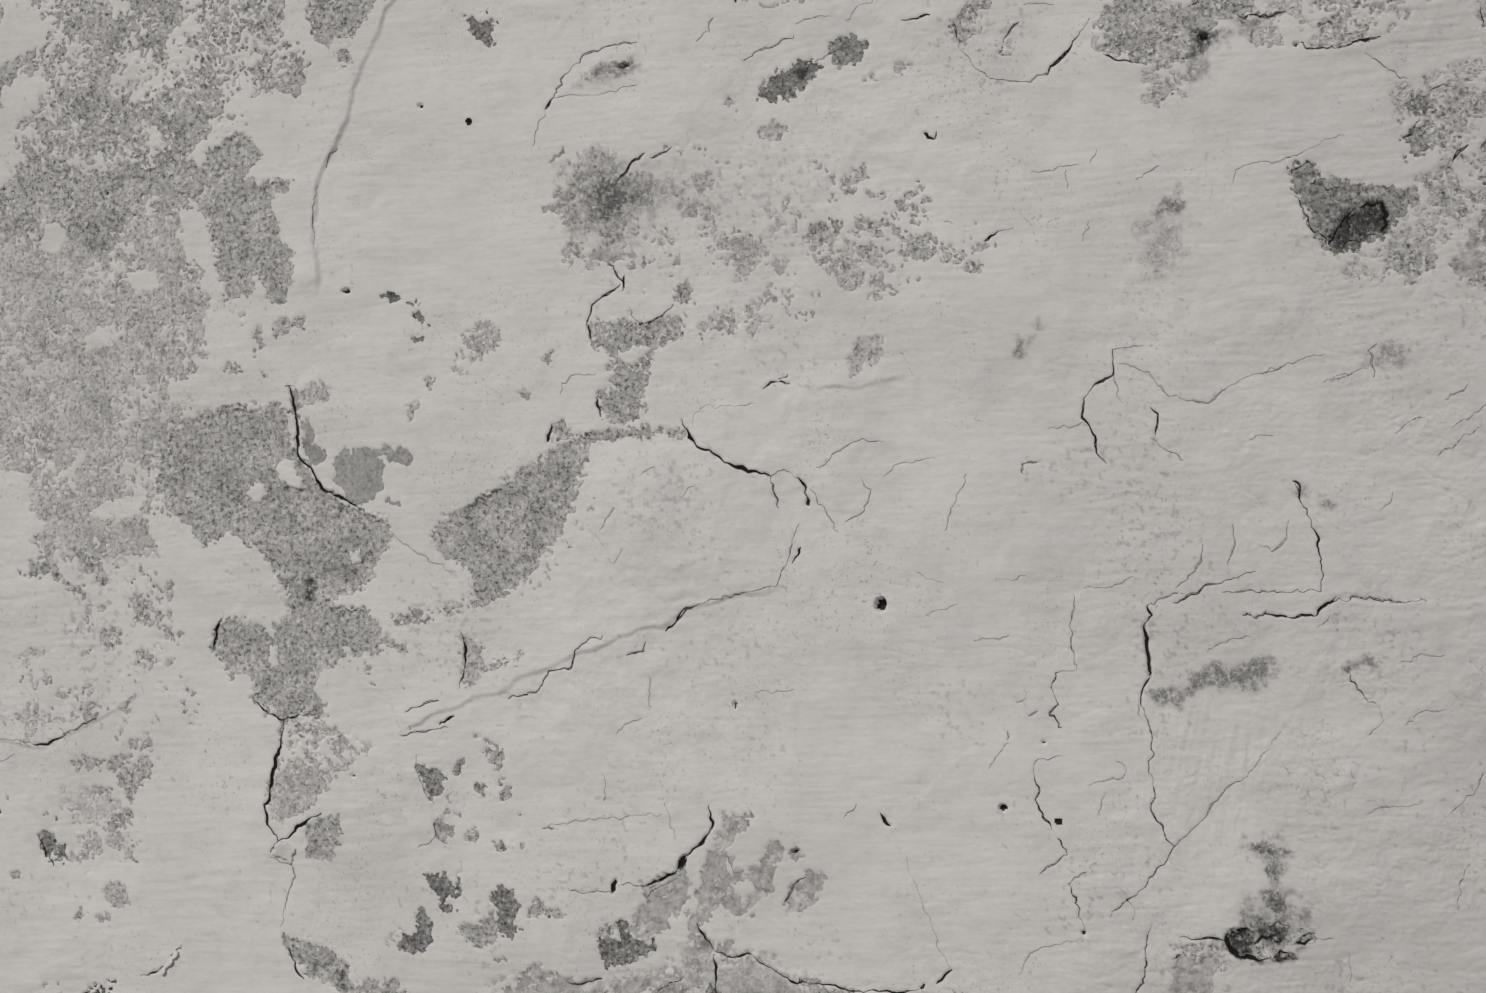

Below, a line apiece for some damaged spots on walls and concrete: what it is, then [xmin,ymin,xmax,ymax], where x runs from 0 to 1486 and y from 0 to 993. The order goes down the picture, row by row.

peeling [1091,0,1411,108]
crack [1237,10,1457,139]
crack [1233,146,1389,248]
peeling [1341,56,1486,291]
crack [286,385,361,510]
peeling [0,0,997,865]
crack [1062,345,1375,464]
crack [509,376,929,732]
crack [2,717,97,761]
crack [991,480,1426,993]
peeling [74,881,131,923]
crack [657,857,952,993]